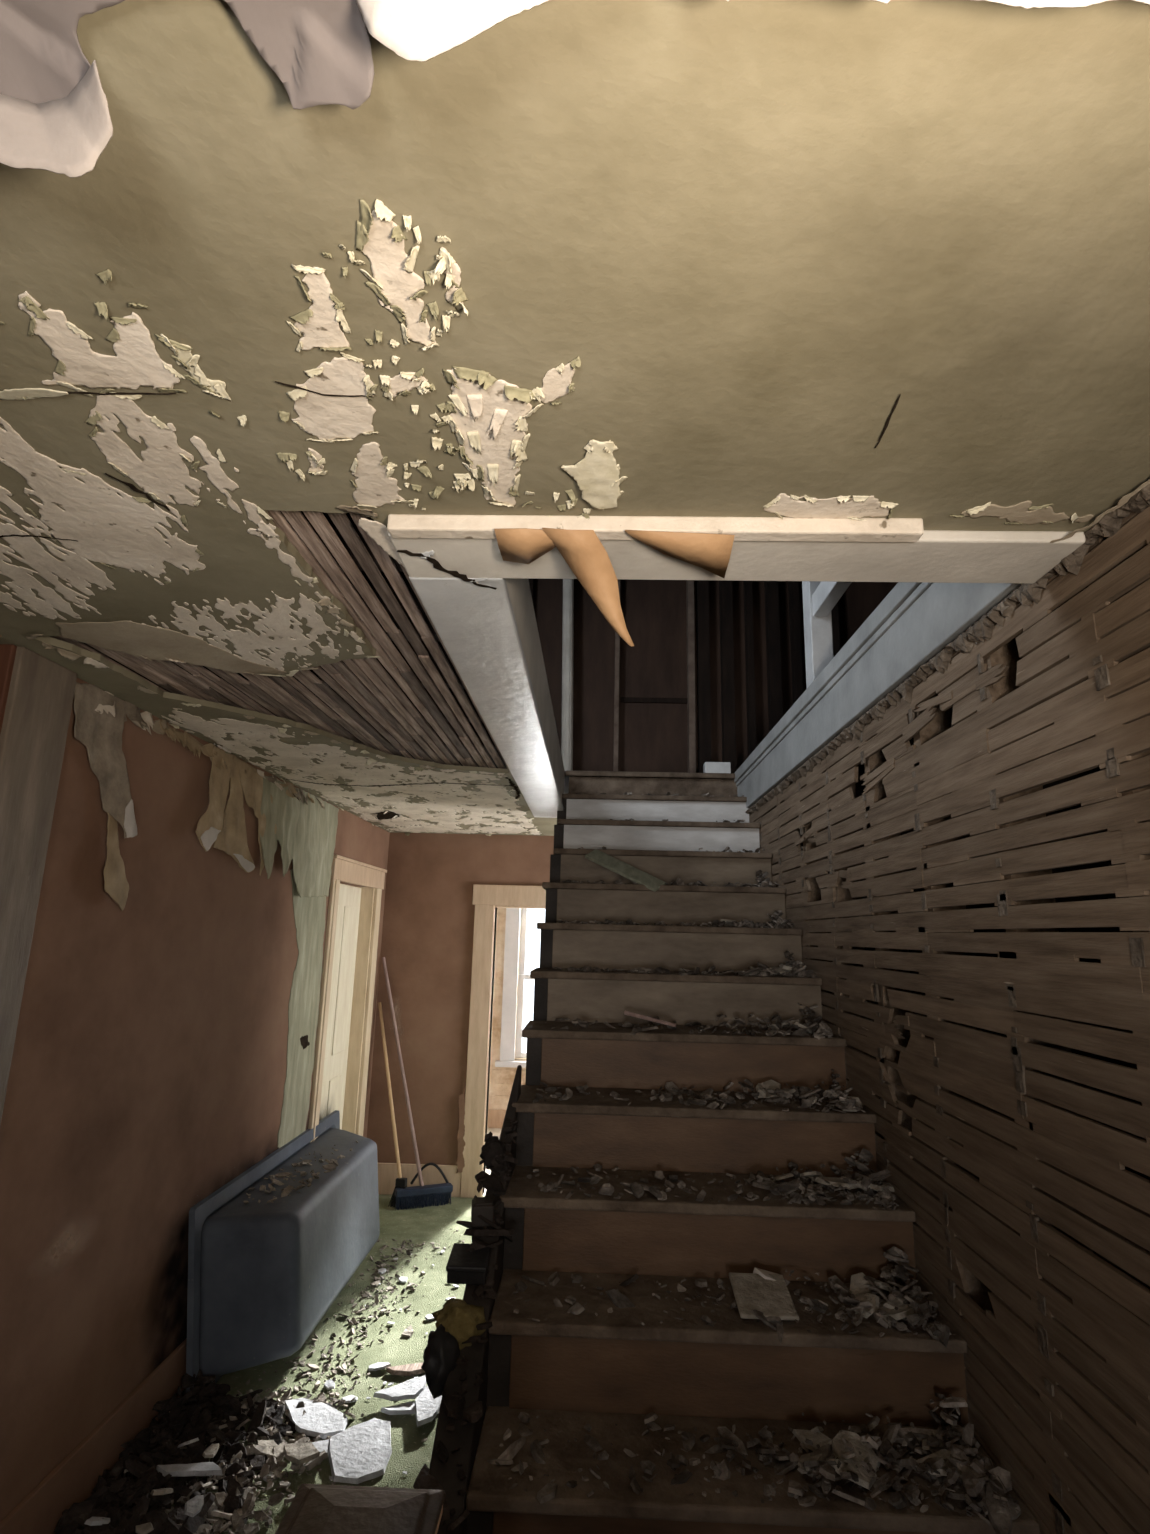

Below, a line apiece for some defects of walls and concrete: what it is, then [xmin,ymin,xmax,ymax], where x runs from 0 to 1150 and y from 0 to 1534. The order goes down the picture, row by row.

peeling [276,199,628,567]
crack [875,394,901,448]
peeling [762,493,899,521]
peeling [949,500,1094,525]
peeling [0,269,543,898]
crack [397,550,497,590]